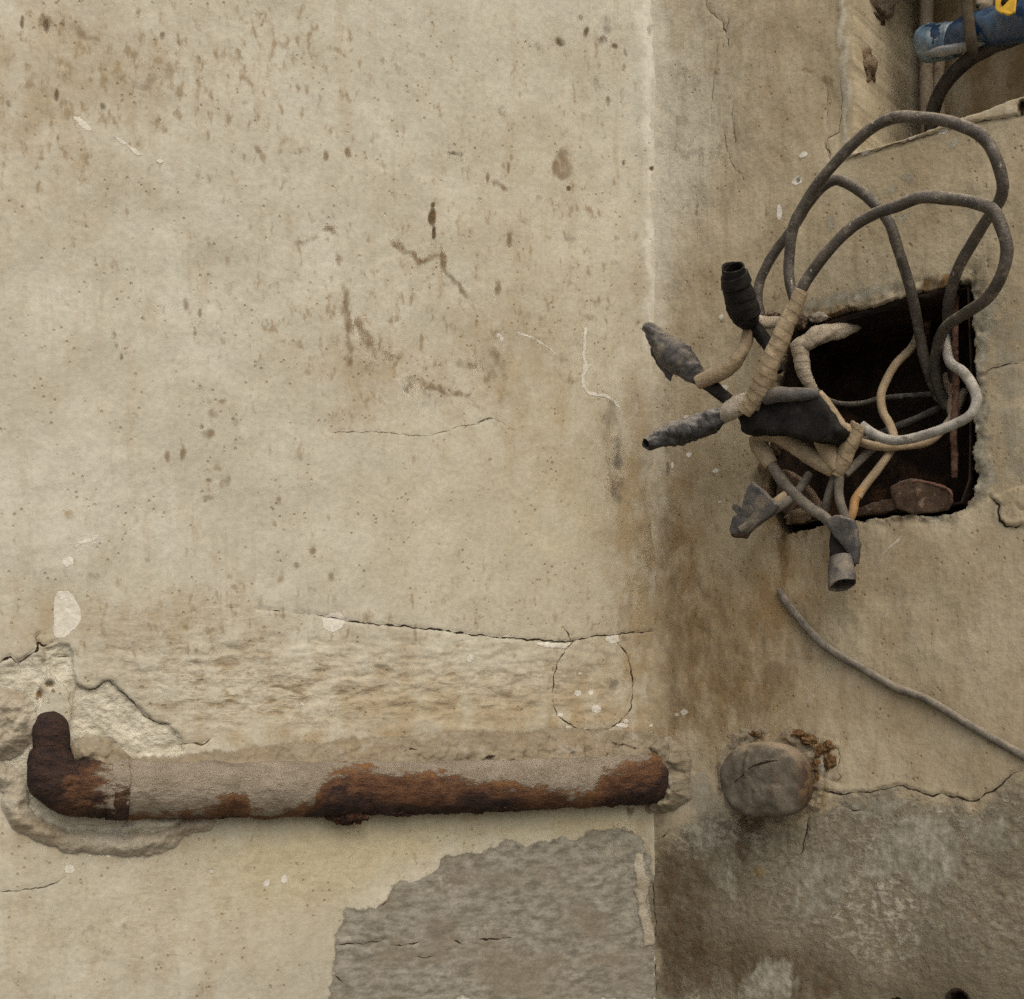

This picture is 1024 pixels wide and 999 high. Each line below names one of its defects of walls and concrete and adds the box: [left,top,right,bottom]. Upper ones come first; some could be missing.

flaking render [0,591,182,759]
crack [268,609,648,755]
flaking render [2,741,130,836]
rust [787,729,836,784]
crack [826,748,1022,811]
peeling [329,827,655,999]